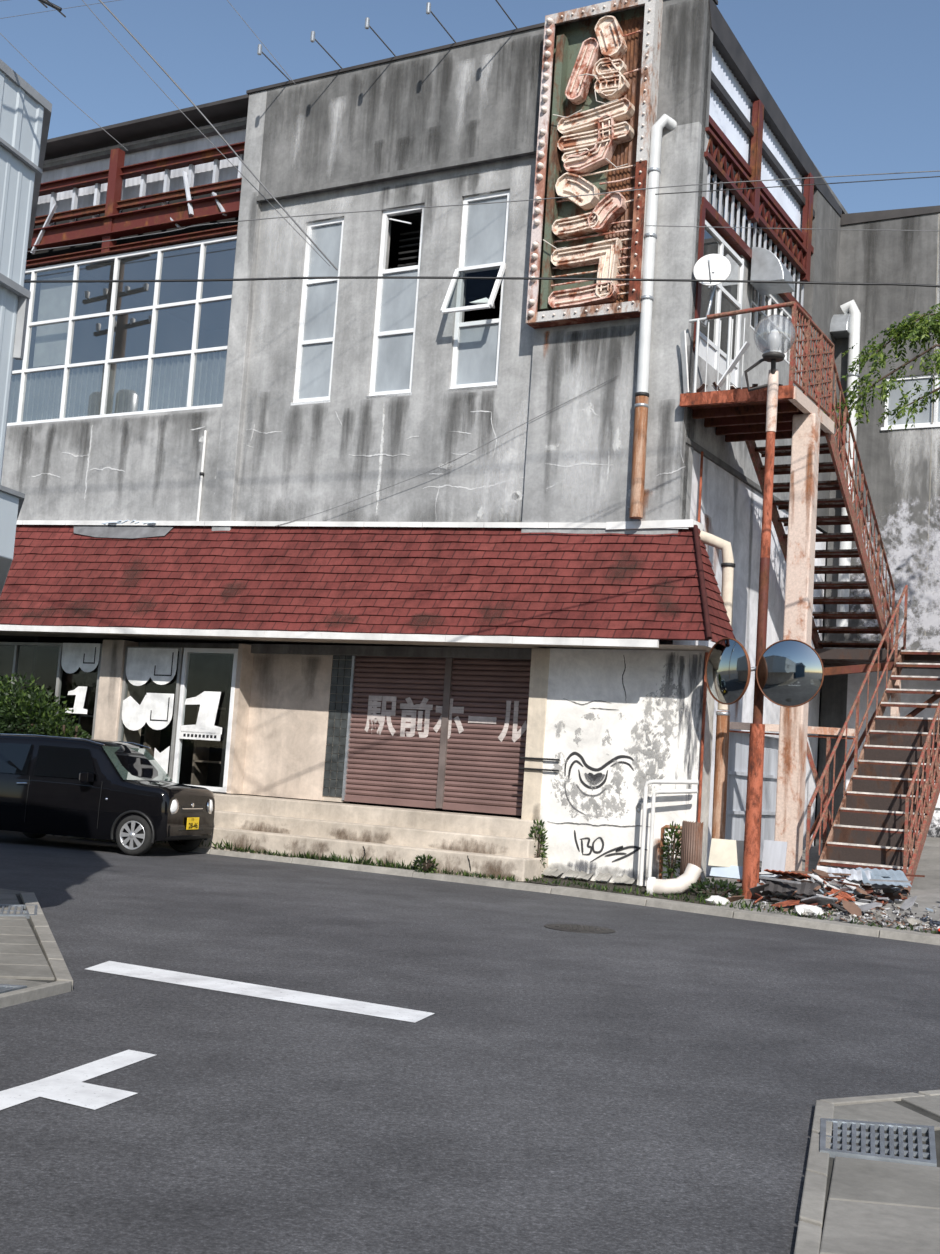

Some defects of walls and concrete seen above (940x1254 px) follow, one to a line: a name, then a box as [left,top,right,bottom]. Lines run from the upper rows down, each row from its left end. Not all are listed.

damp [376,402,402,512]
damp [612,427,621,452]
rust [791,448,812,502]
flaking render [851,499,940,650]
peeling [552,670,684,821]
rust [784,707,803,754]